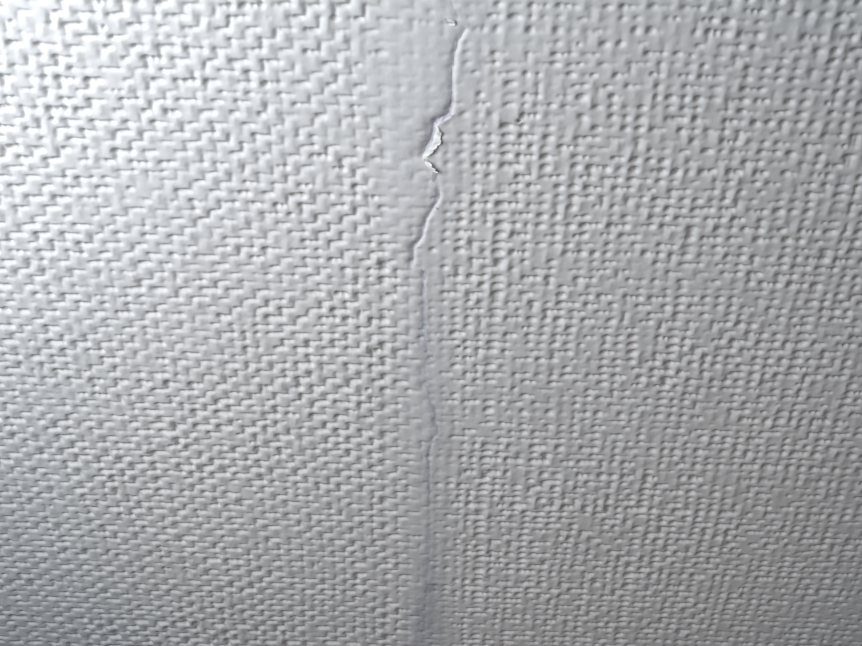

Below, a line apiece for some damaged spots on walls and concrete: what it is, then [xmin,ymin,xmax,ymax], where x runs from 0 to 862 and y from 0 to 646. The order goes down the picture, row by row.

crack [421,29,465,157]